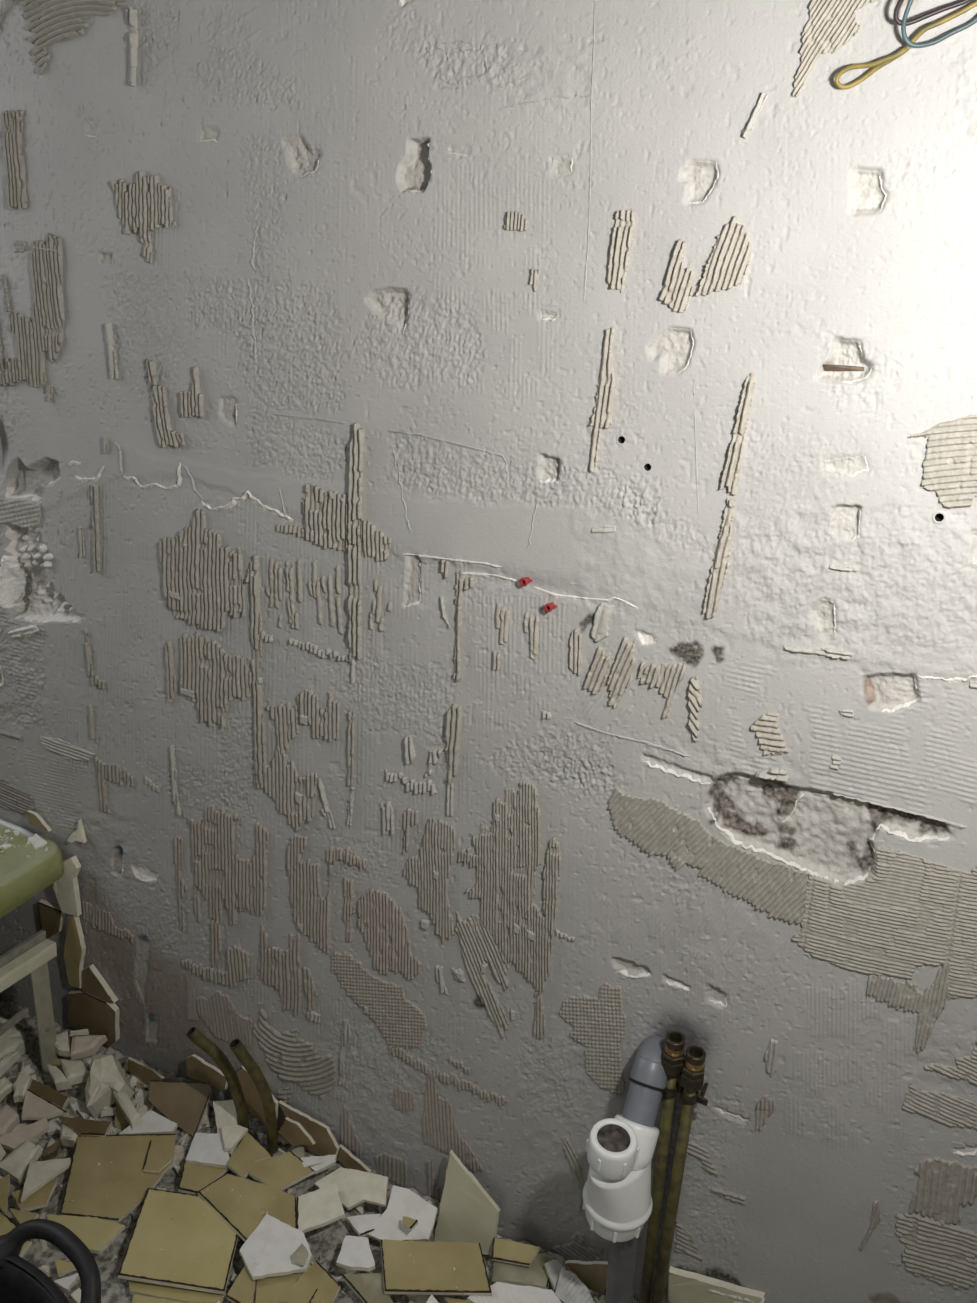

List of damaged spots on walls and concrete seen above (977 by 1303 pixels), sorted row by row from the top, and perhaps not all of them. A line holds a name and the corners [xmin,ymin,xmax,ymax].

flaking render [399,137,432,193]
flaking render [366,289,410,336]
flaking render [815,339,874,384]
flaking render [0,422,61,501]
crack [67,439,294,522]
flaking render [538,454,561,484]
flaking render [0,524,81,624]
flaking render [862,674,920,713]
spalling [0,810,52,850]
flaking render [641,753,951,886]
flaking render [611,957,728,1008]
spalling [0,1054,608,1303]